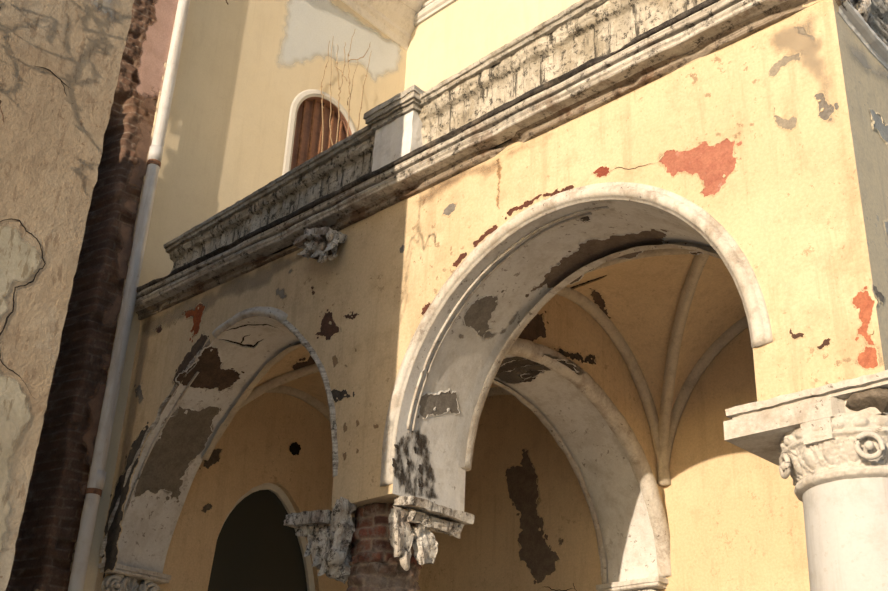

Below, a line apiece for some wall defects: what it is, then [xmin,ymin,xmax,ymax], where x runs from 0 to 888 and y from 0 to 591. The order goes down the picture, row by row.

flaking render [136,0,178,111]
flaking render [128,121,153,189]
spalling [658,137,742,198]
spalling [525,228,669,297]
crack [0,218,46,396]
spalling [173,333,244,392]
crack [218,324,277,348]
spalling [851,283,885,370]
spalling [416,388,461,420]
spalling [101,405,223,578]
peeling [391,430,436,499]
spalling [505,448,564,584]